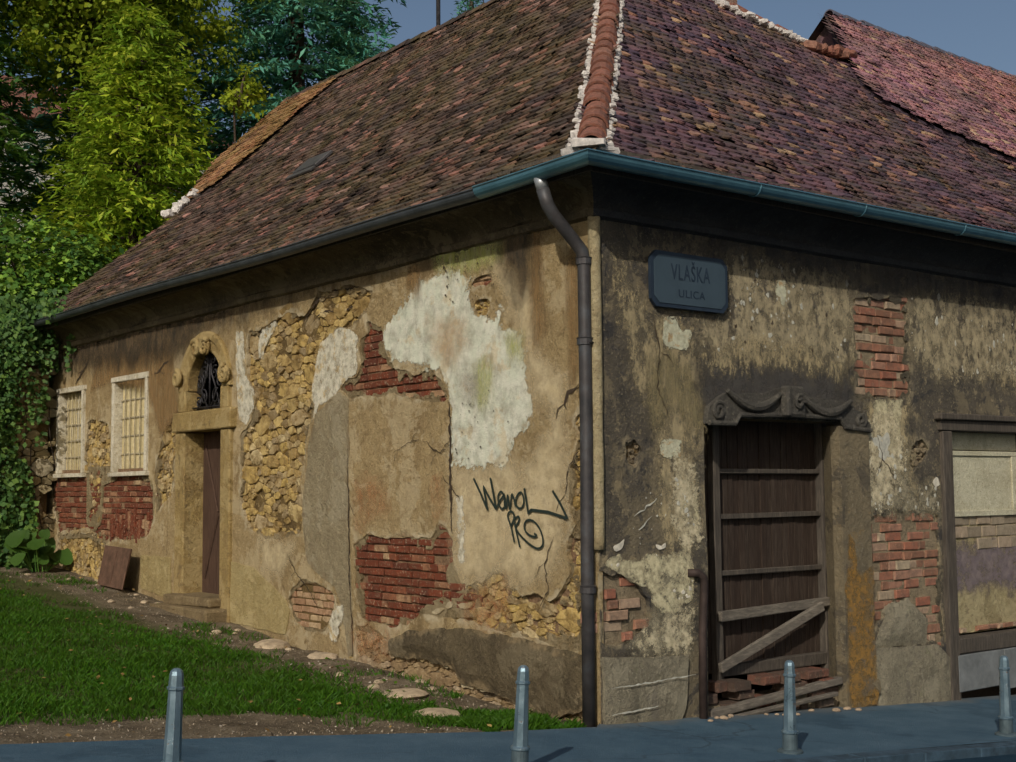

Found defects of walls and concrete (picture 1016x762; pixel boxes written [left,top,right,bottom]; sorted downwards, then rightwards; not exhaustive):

crack [556,385,578,418]
flaking render [594,248,1016,657]
peeling [236,261,582,709]
water stain [956,539,1016,592]
water stain [635,603,696,657]